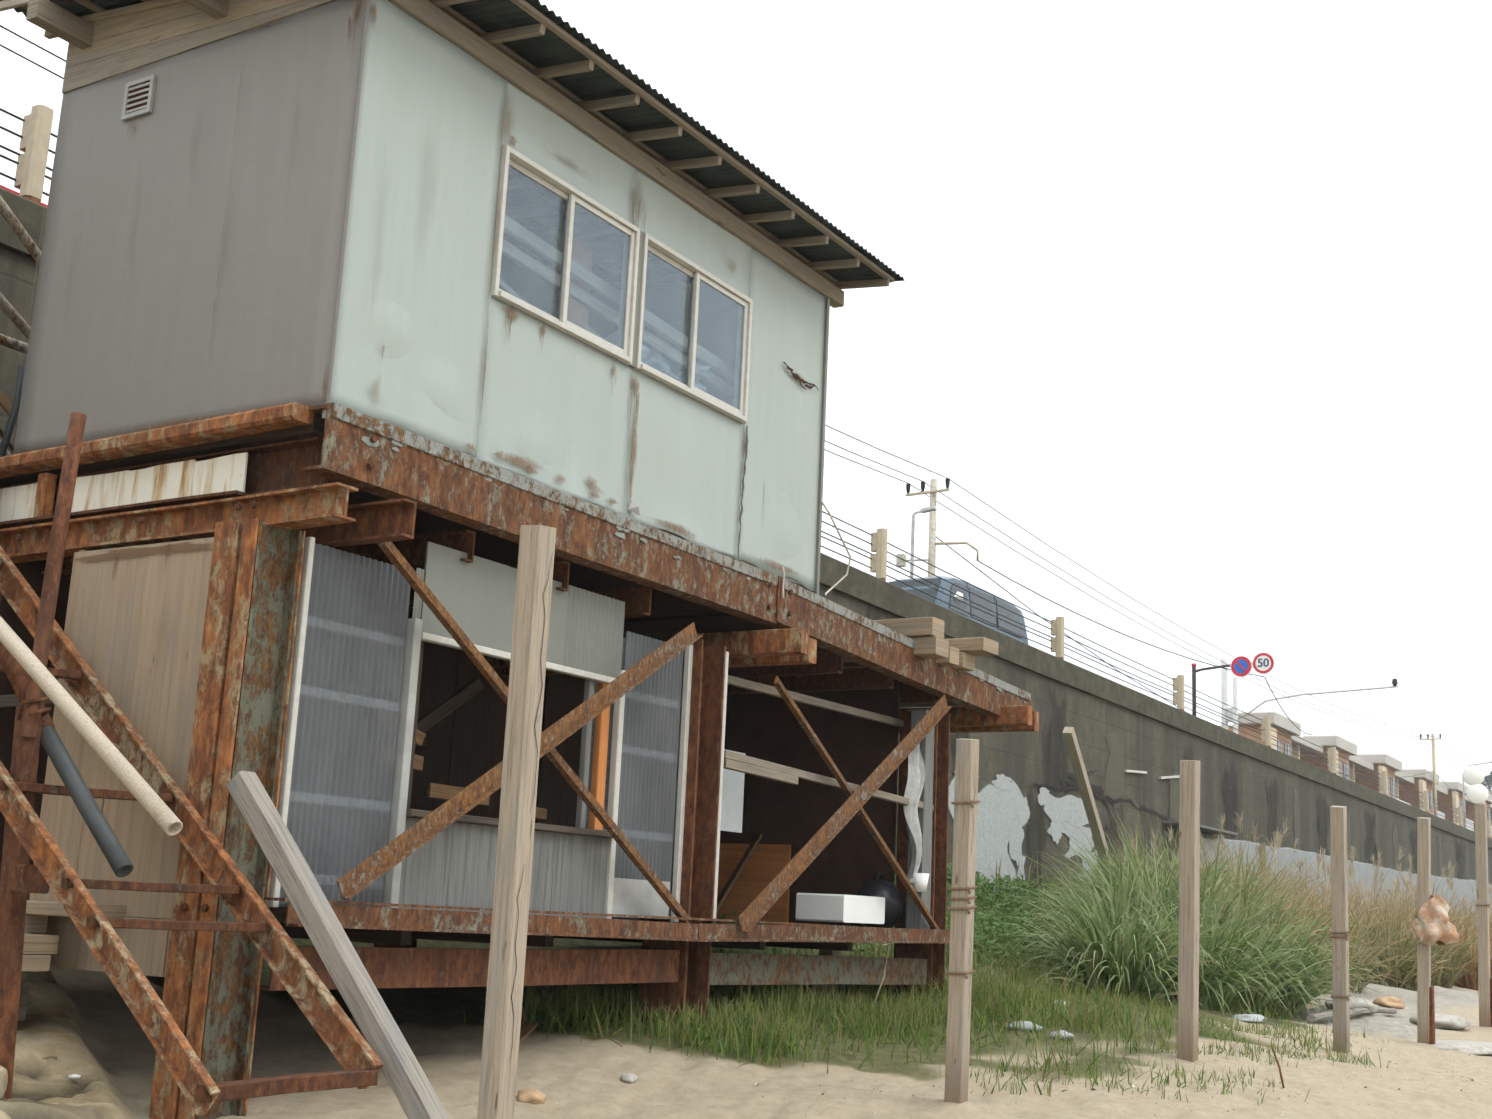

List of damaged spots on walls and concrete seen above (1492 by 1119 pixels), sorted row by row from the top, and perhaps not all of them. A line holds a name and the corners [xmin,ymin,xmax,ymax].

peeling [361,436,433,456]
corrosion [587,378,639,504]
corrosion [496,452,536,473]
peeling [615,525,648,543]
peeling [975,772,1105,894]